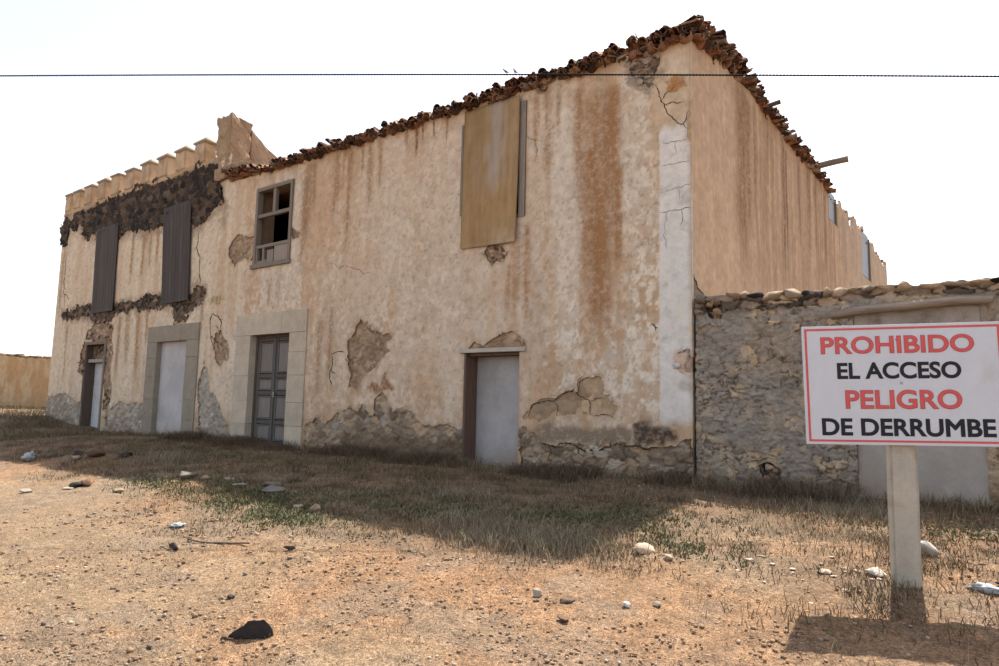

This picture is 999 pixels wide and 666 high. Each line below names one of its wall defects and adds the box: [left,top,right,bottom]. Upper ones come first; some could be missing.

crack [657,82,692,236]
flaking render [59,160,224,247]
flaking render [229,235,254,266]
flaking render [60,285,207,435]
flaking render [213,331,229,366]
flaking render [345,320,392,389]
flaking render [470,331,526,349]
flaking render [43,393,81,426]
flaking render [195,367,230,438]
flaking render [303,392,462,463]
flaking render [518,373,694,481]